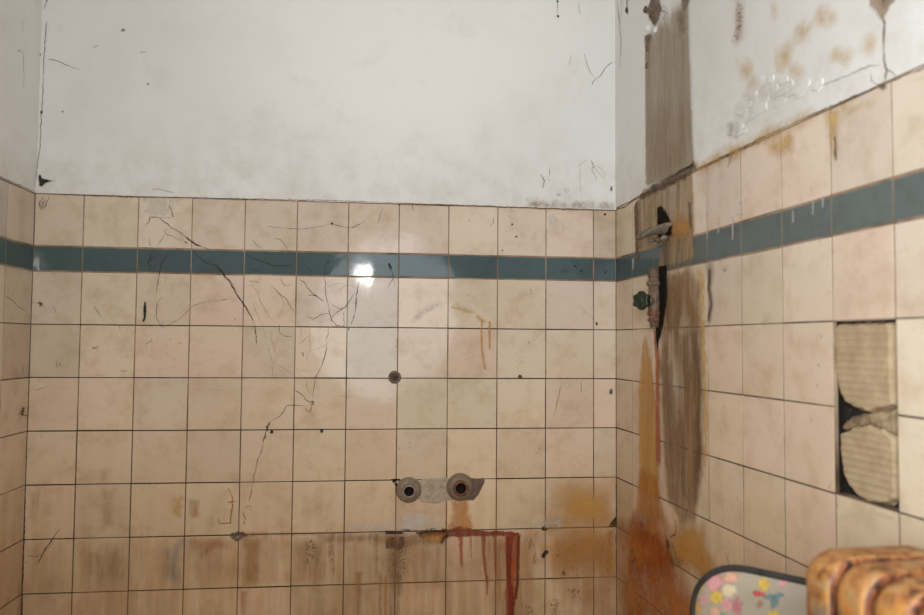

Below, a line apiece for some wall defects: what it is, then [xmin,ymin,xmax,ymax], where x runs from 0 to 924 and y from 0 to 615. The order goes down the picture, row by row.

crack [0,0,924,211]
flaking render [643,0,693,185]
peeling [835,320,899,508]
corrosion [418,501,522,615]
corrosion [622,514,711,615]